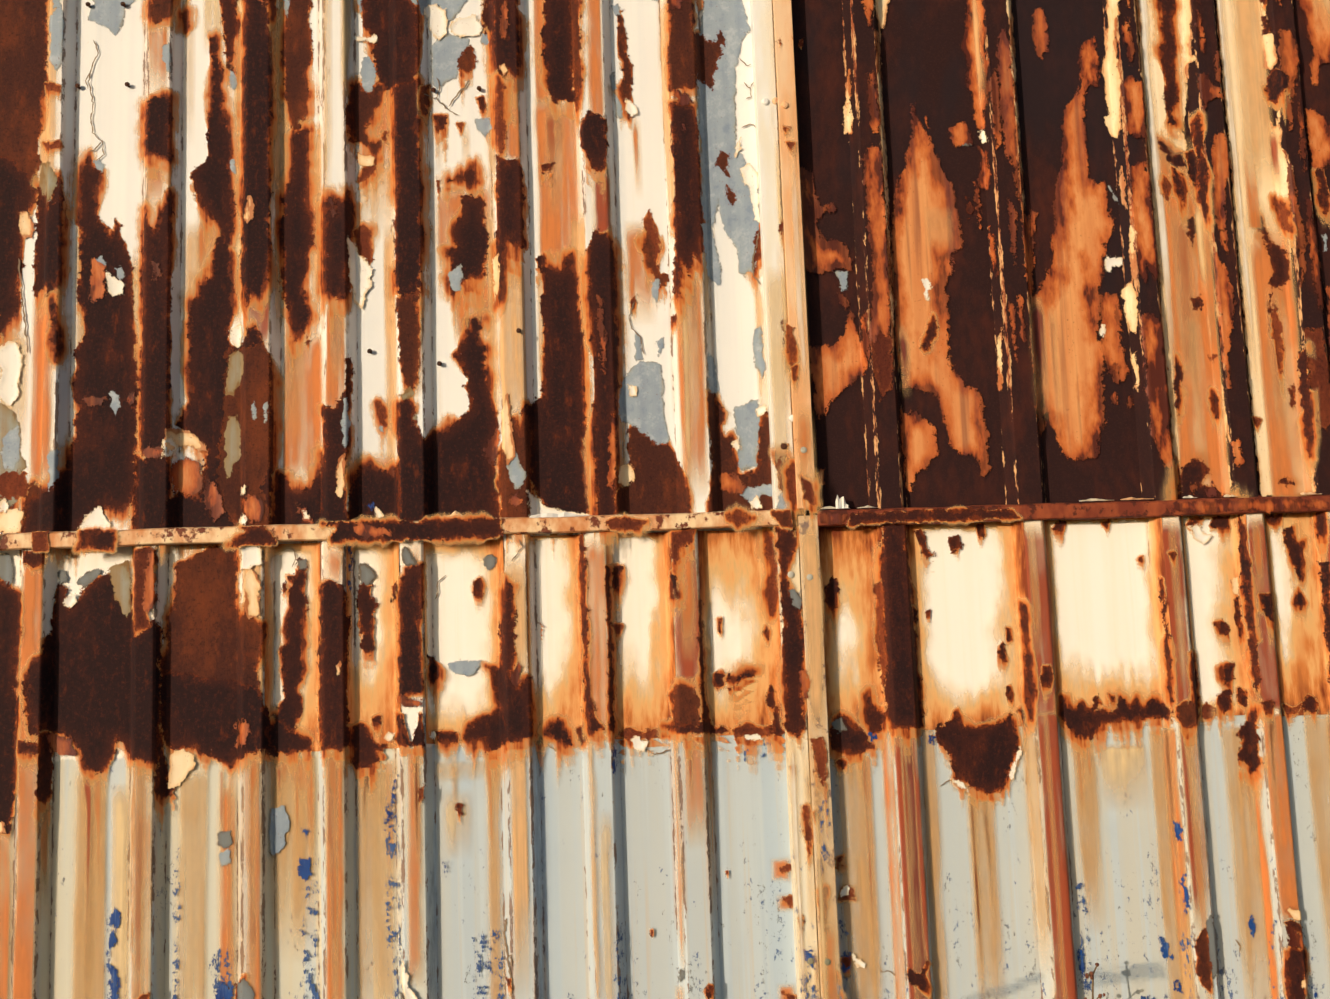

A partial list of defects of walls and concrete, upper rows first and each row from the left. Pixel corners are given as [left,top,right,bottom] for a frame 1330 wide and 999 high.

peeling [88,0,134,36]
rust [973,0,981,86]
peeling [652,0,760,285]
rust [1139,0,1247,500]
rust [1217,0,1330,497]
peeling [47,449,60,491]
rust [0,0,820,999]
peeling [596,294,608,374]
peeling [606,333,669,491]
peeling [707,353,719,394]
peeling [718,399,787,510]
rust [1031,304,1054,383]